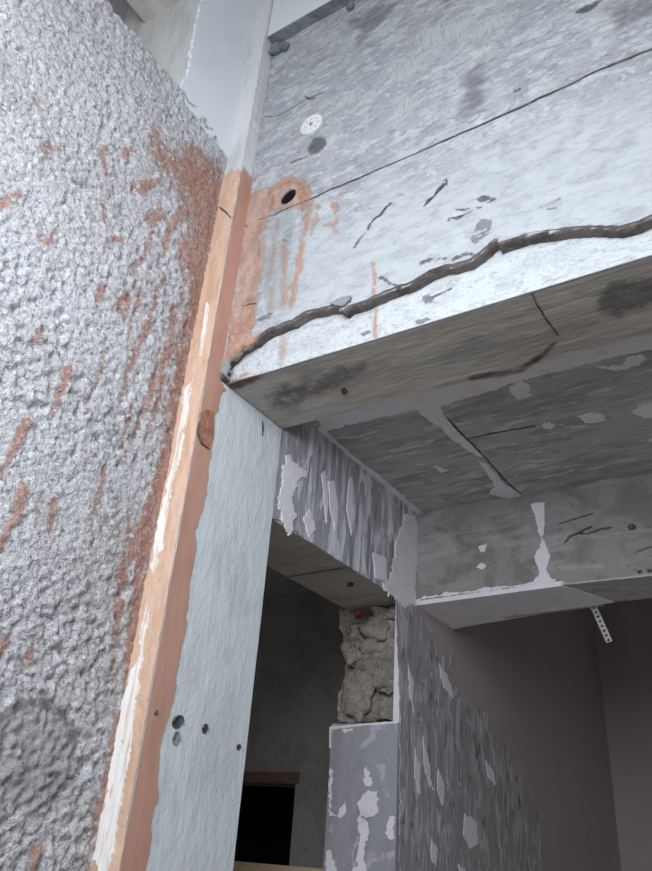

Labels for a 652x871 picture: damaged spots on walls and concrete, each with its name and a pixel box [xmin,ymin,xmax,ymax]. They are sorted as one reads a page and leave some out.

crack [258,48,652,220]
crack [354,202,392,248]
crack [220,214,652,383]
rust [50,365,72,420]
rust [0,482,29,552]
rust [0,418,32,474]
rust [45,497,58,541]
rust [90,128,338,871]
peeling [277,455,316,537]
crack [443,414,535,496]
crack [558,513,613,543]
peeling [317,334,652,871]